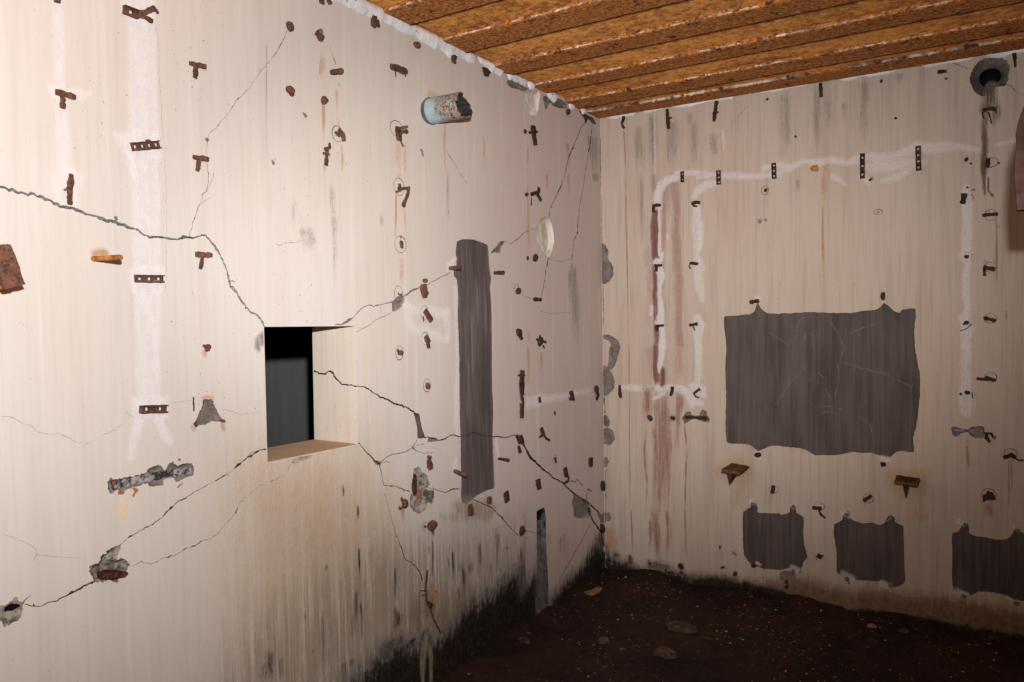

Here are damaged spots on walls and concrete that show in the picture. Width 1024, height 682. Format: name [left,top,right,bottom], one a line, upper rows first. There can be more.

crack [0,23,286,327]
damp [117,0,173,461]
damp [640,83,1016,367]
spalling [193,397,226,427]
damp [617,383,706,408]
spalling [0,597,24,627]
crack [23,581,97,607]
spalling [89,544,130,583]
spalling [107,458,194,497]
crack [122,449,290,565]
crack [314,370,606,585]
damp [341,534,788,682]